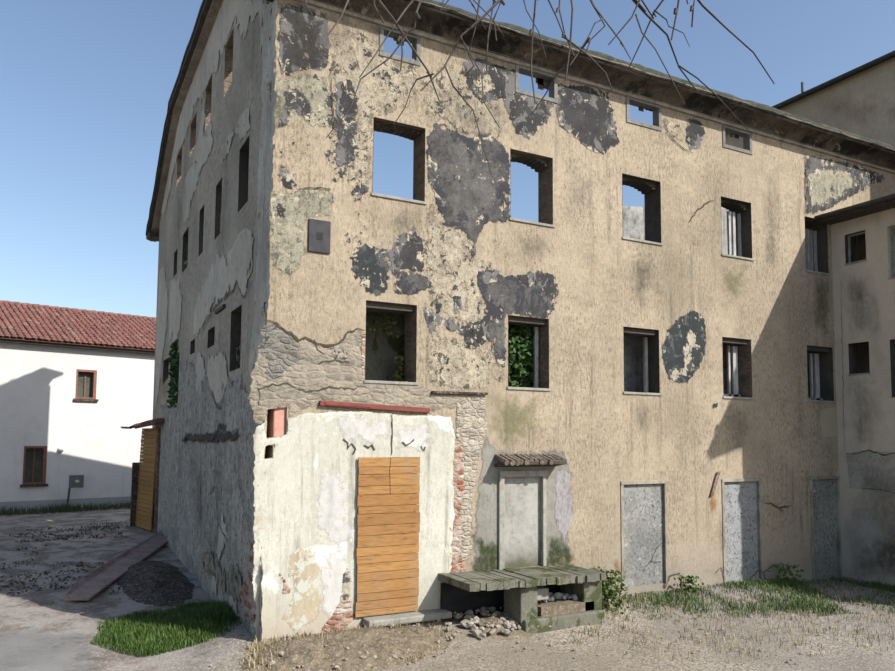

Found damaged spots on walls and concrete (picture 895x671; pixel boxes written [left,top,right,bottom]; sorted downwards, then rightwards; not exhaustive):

spalling [804,155,884,214]
flaking render [155,0,619,642]
peeling [662,310,706,383]
crack [840,284,895,456]